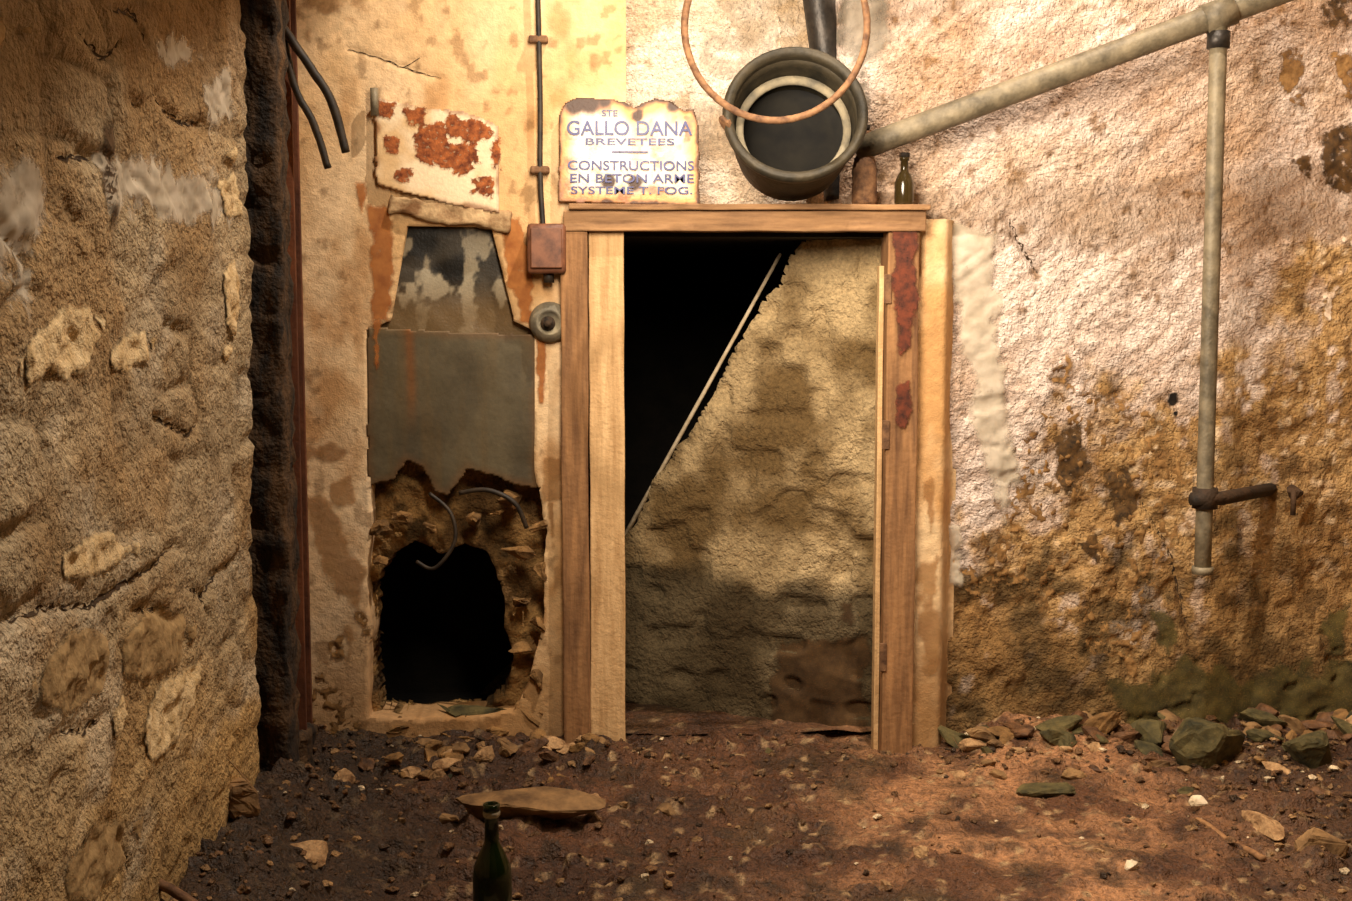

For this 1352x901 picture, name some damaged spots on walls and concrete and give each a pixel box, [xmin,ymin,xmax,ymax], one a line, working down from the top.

leakage [1320,0,1351,29]
peeling [1316,285,1339,320]
spalling [328,461,548,734]
spalling [312,672,362,735]